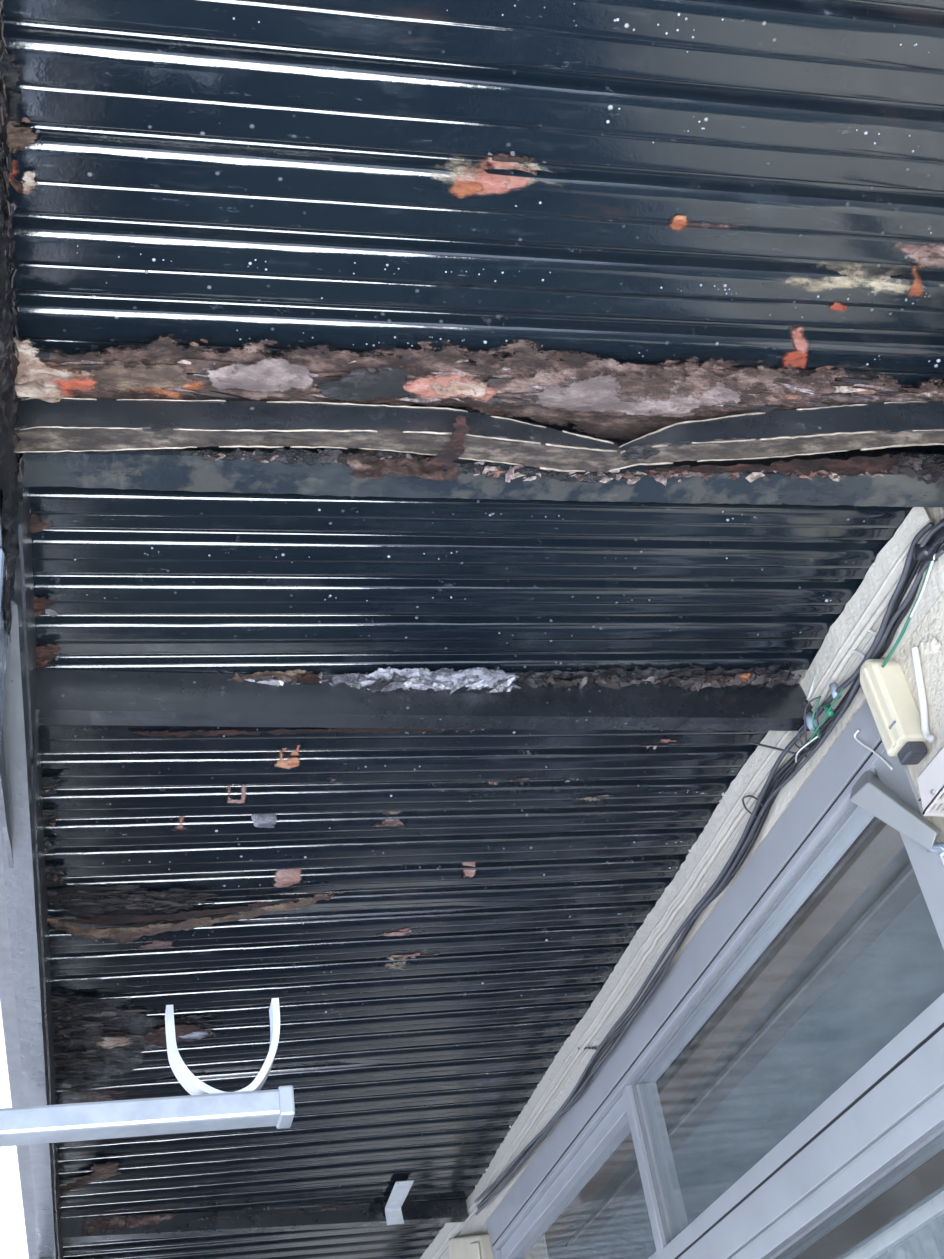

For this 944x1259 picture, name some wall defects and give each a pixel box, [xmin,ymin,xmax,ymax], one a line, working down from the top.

rust [433,151,549,198]
rust [670,215,728,230]
rust [783,327,808,368]
peeling [350,669,802,694]
rust [275,745,301,769]